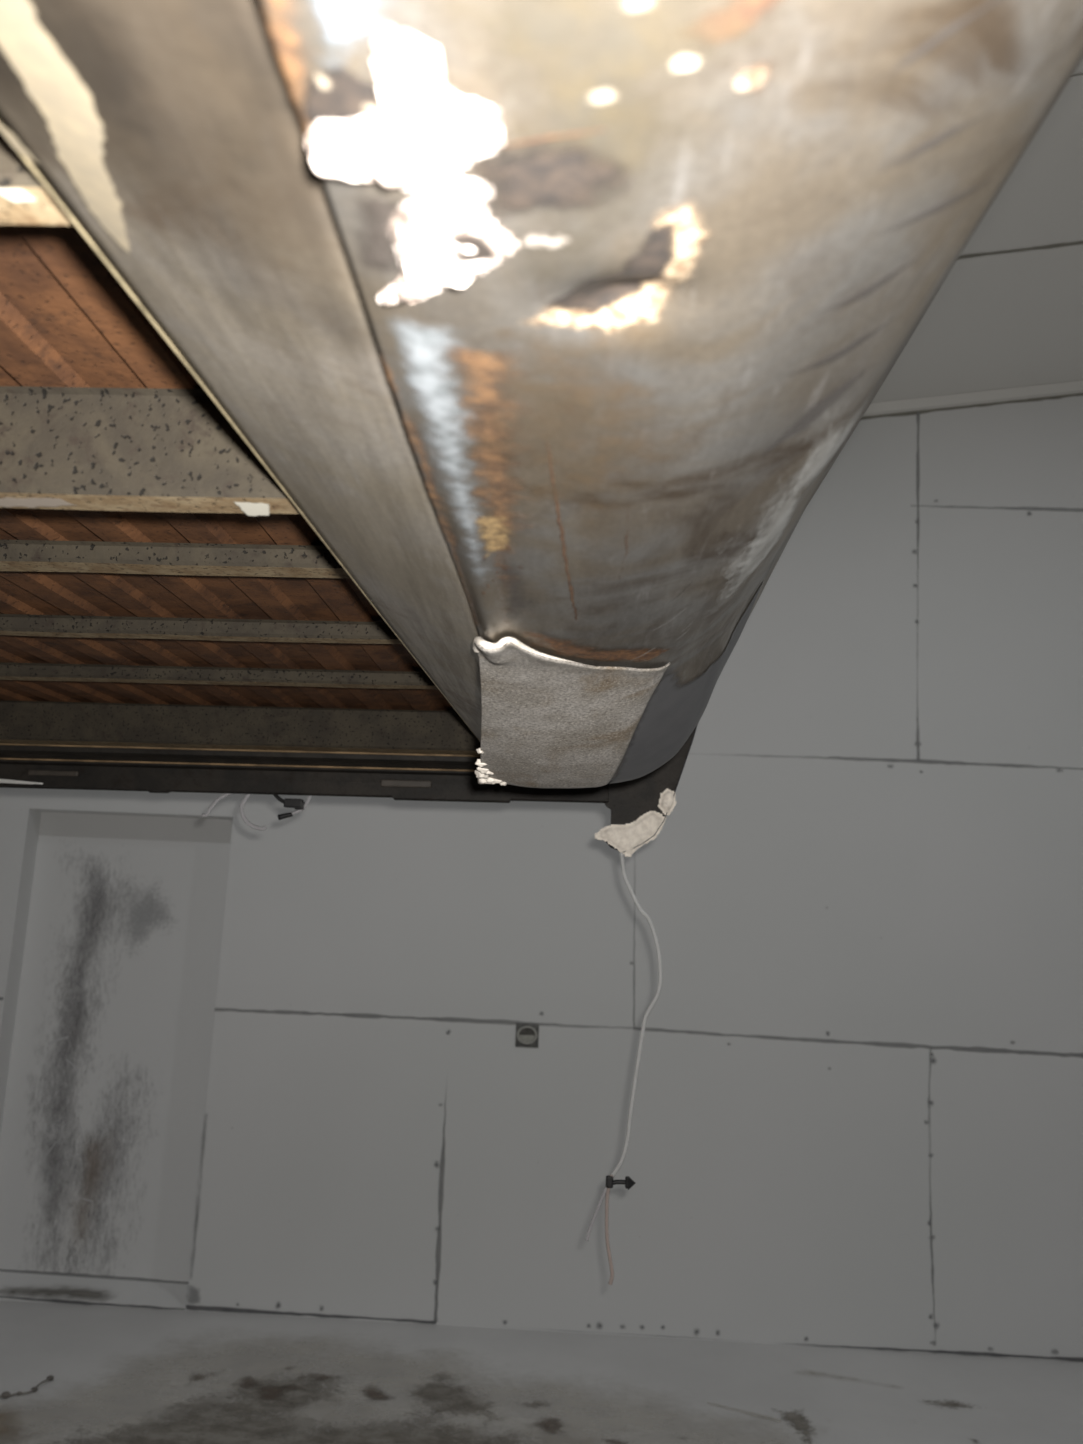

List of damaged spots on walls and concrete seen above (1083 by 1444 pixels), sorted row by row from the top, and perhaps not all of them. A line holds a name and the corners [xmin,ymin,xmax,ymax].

peeling [0,0,129,252]
peeling [306,116,519,304]
damp [782,1412,812,1444]